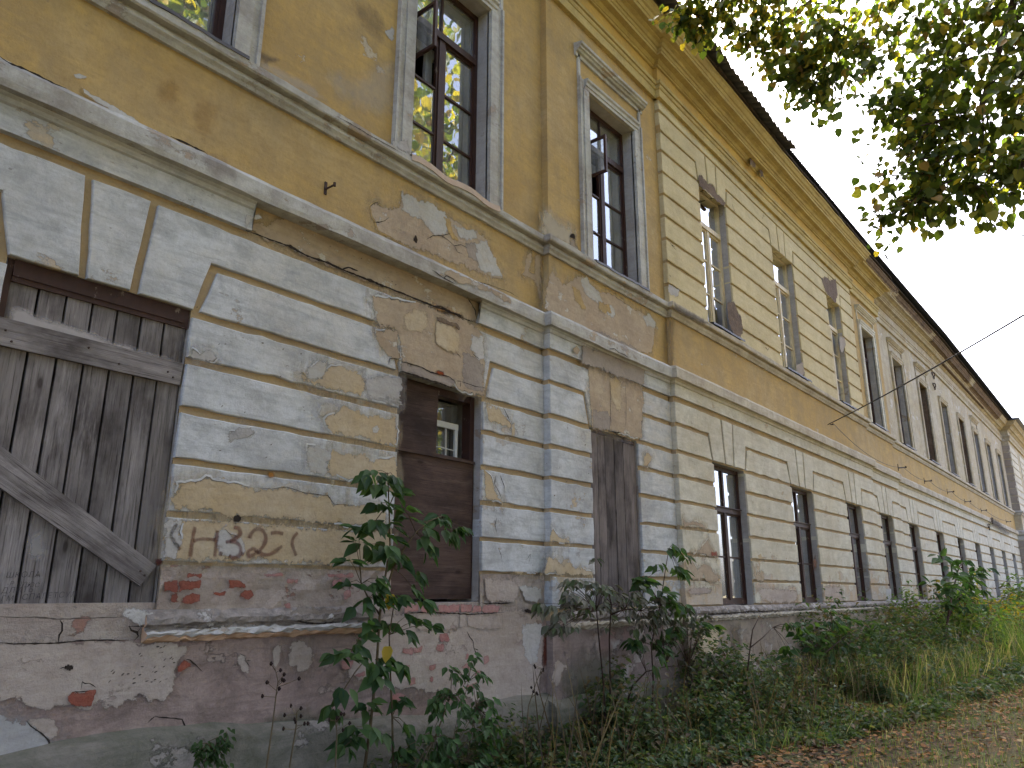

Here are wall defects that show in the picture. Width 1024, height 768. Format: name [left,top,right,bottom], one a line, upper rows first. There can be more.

flaking render [245,214,512,428]
crack [246,230,519,325]
peeling [369,191,505,282]
flaking render [521,253,656,354]
peeling [301,360,403,484]
flaking render [588,365,644,440]
peeling [162,468,389,625]
flaking render [341,557,593,702]
peeling [0,635,191,755]